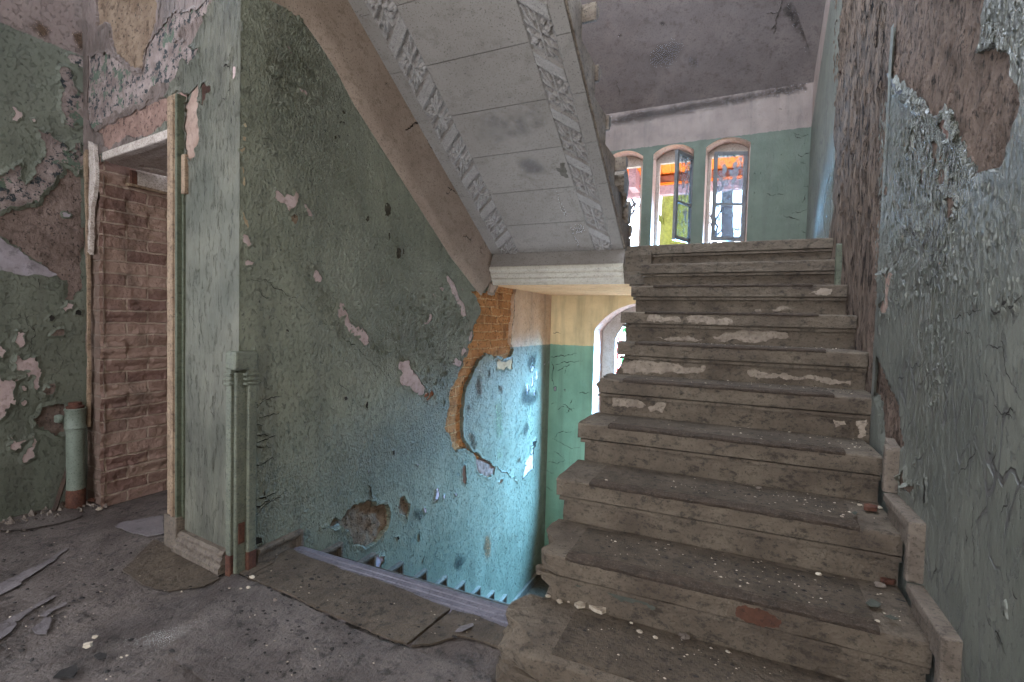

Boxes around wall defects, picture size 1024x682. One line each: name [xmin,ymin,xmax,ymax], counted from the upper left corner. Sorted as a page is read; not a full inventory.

peeling [0,0,215,339]
peeling [270,186,314,220]
flaking render [833,0,1024,447]
flaking render [0,328,71,466]
flaking render [318,271,517,568]
crack [546,332,586,491]
peeling [612,397,666,413]
peeling [620,360,706,375]
peeling [646,314,789,343]
peeling [747,368,851,385]
crack [953,295,1024,418]
crack [256,488,285,515]